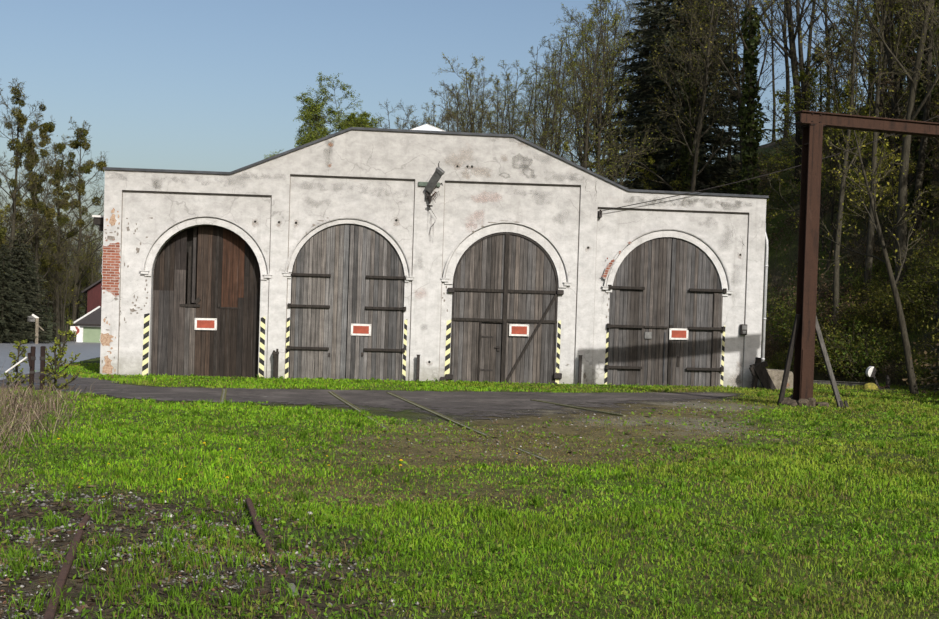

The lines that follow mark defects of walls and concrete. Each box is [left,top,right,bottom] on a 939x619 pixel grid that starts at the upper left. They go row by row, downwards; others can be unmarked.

flaking render [101,207,148,300]
peeling [100,316,116,375]